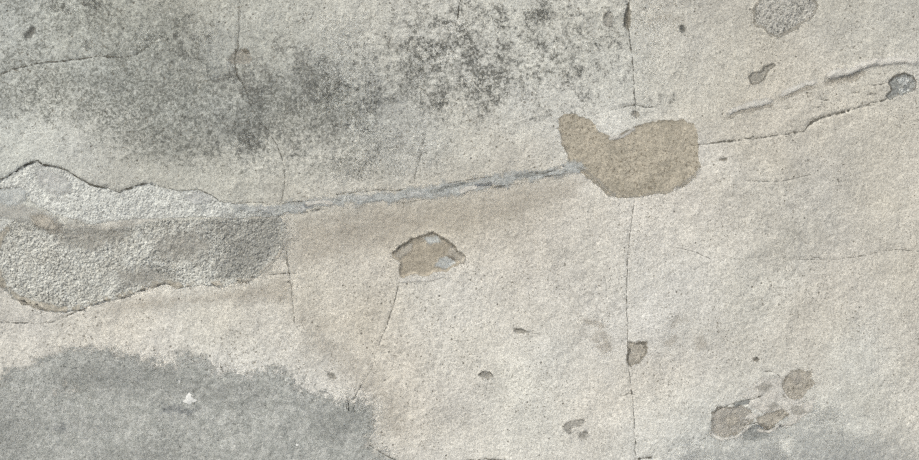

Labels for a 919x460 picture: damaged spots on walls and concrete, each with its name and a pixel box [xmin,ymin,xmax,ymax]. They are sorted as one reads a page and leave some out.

spalling [752,0,818,37]
damp [216,58,272,110]
damp [285,0,590,121]
crack [693,83,886,146]
spalling [558,111,701,198]
spalling [0,161,318,313]
spalling [391,232,465,283]
spalling [626,341,647,367]
damp [0,346,395,460]
peeling [709,369,815,441]